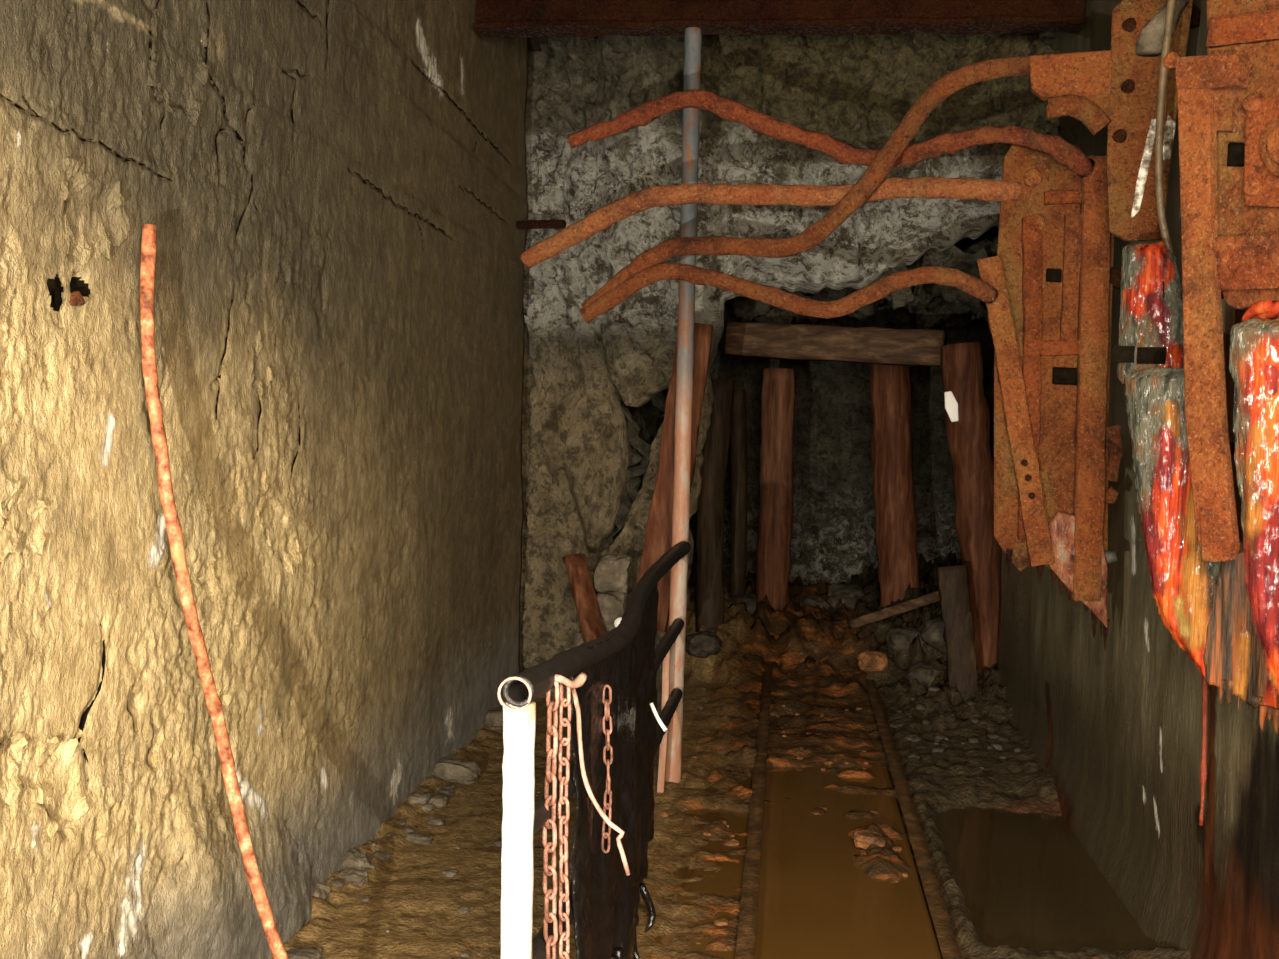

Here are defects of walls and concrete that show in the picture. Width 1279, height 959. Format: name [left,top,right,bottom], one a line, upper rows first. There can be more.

crack [0,94,183,181]
crack [204,3,258,235]
crack [282,0,329,139]
crack [411,61,508,160]
crack [348,168,451,250]
corrosion [1225,308,1246,541]
leakage [1244,423,1269,557]
leakage [1264,365,1279,395]
leakage [1195,805,1216,888]
leakage [1232,728,1279,927]